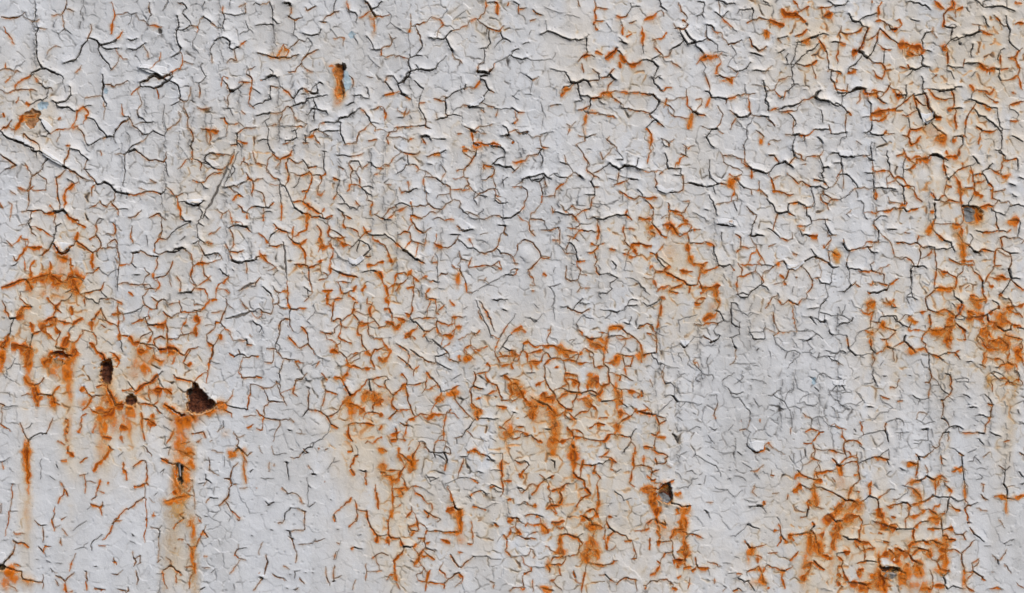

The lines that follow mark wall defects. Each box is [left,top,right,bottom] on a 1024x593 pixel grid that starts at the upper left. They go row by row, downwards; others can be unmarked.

crack [0,0,277,384]
crack [205,0,1024,593]
crack [24,377,60,407]
rust [23,342,143,437]
crack [77,384,128,442]
crack [122,371,184,454]
rust [345,392,382,415]
rust [515,381,575,475]
rust [598,325,622,365]
rust [982,306,1022,391]
crack [34,427,252,593]
rust [865,533,949,593]